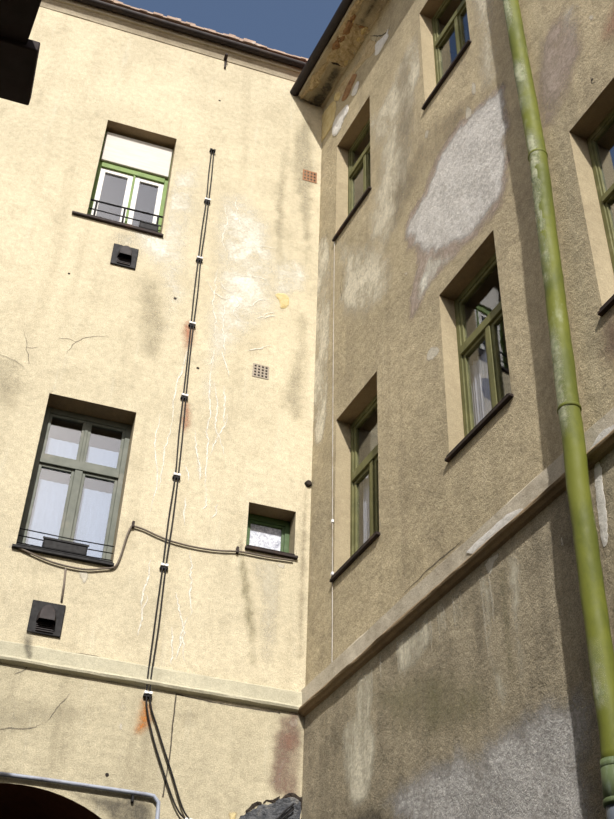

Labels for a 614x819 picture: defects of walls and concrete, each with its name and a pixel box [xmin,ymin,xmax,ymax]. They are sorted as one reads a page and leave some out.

peeling [300,0,364,99]
flaking render [321,30,388,143]
flaking render [405,86,509,317]
water stain [397,621,432,676]
spalling [229,793,302,819]
water stain [273,715,299,793]
water stain [345,675,374,804]
water stain [395,700,588,819]